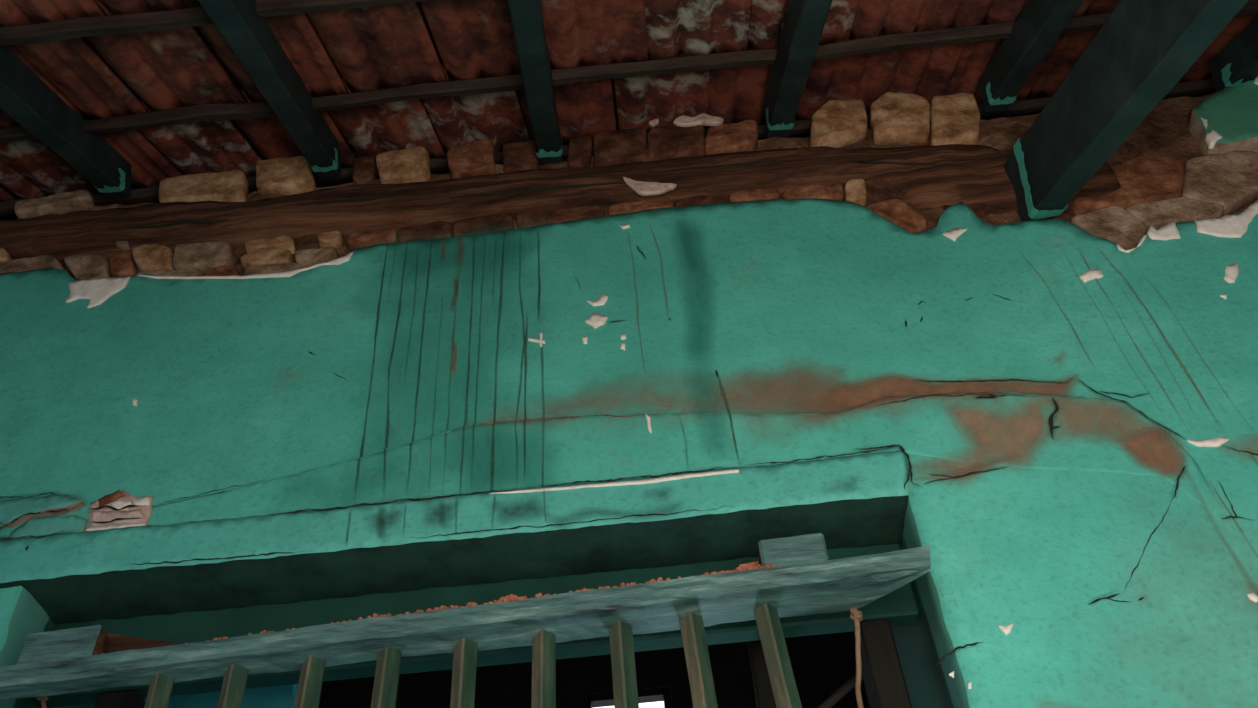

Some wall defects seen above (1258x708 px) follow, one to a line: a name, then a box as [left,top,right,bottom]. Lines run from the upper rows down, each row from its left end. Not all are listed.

peeling [1201,117,1222,149]
peeling [1116,221,1181,253]
peeling [1194,201,1258,238]
peeling [66,251,354,308]
peeling [582,293,608,344]
flaking render [0,489,153,541]
crack [871,377,1186,605]
crack [1218,481,1257,520]